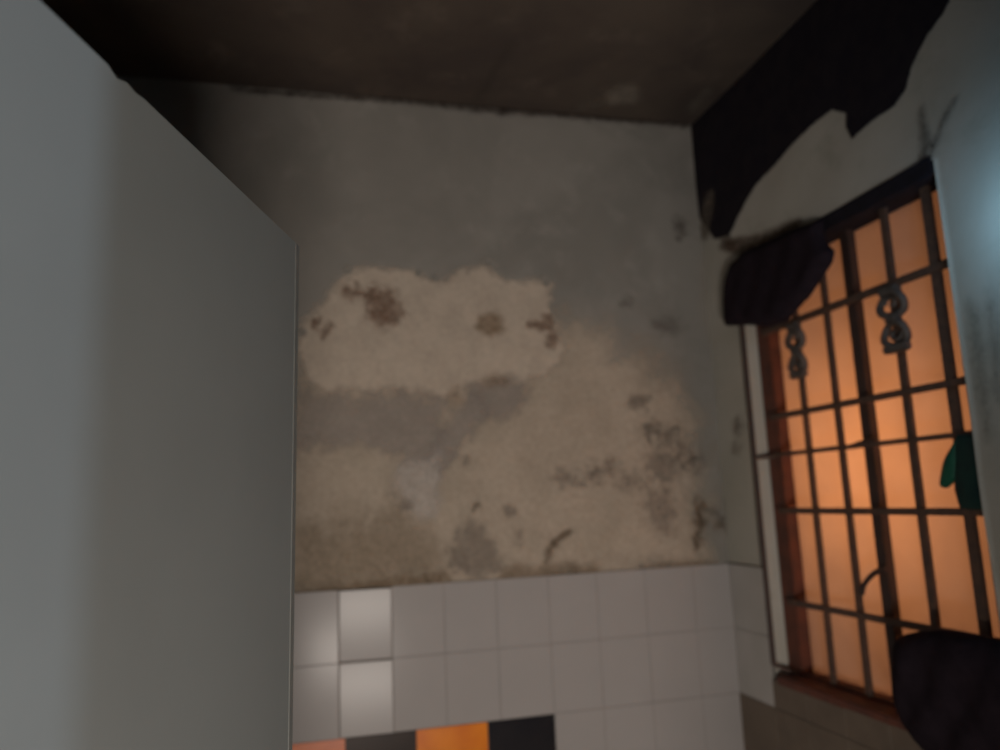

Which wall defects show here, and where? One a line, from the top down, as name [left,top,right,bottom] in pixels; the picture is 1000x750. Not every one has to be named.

peeling [691,0,949,239]
peeling [295,257,712,592]